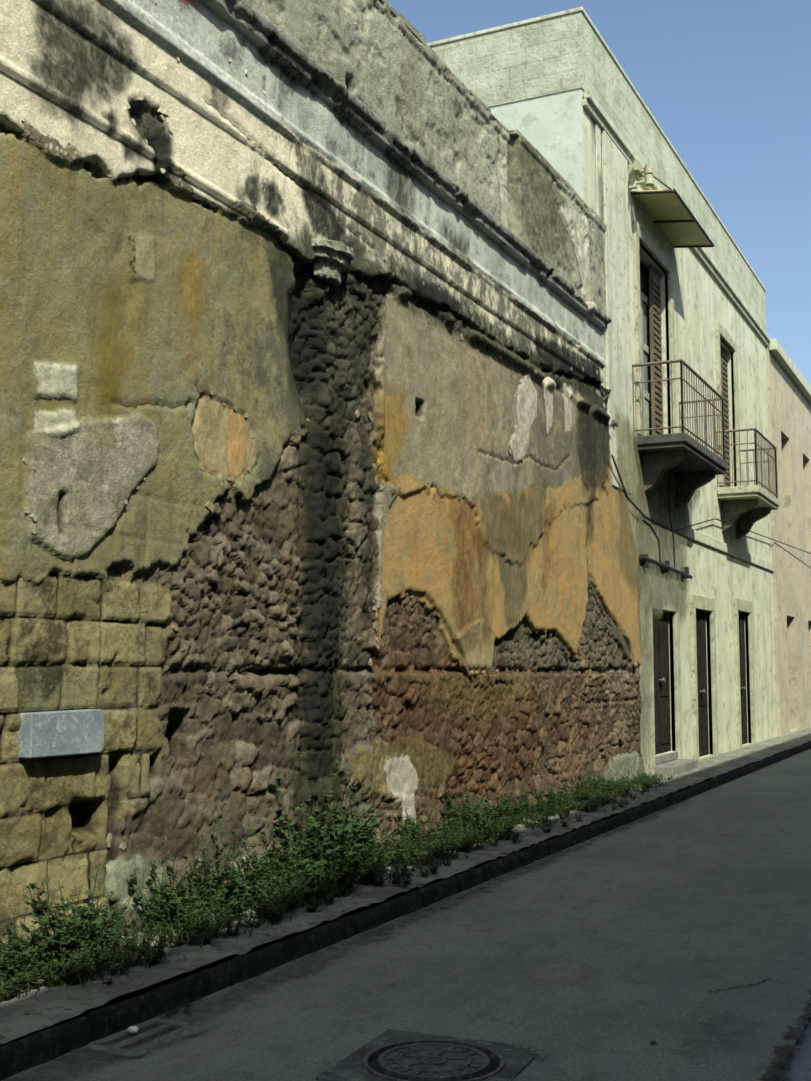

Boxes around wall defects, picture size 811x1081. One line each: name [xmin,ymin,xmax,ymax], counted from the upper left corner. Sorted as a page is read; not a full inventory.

water stain [32,0,143,158]
spalling [126,91,174,184]
water stain [239,175,283,216]
water stain [389,171,413,217]
water stain [508,136,566,257]
flaking render [191,391,257,482]
flaking render [508,373,574,468]
water stain [270,169,407,851]
flaking render [368,462,641,678]
water stain [577,387,699,759]
spalling [106,833,126,851]